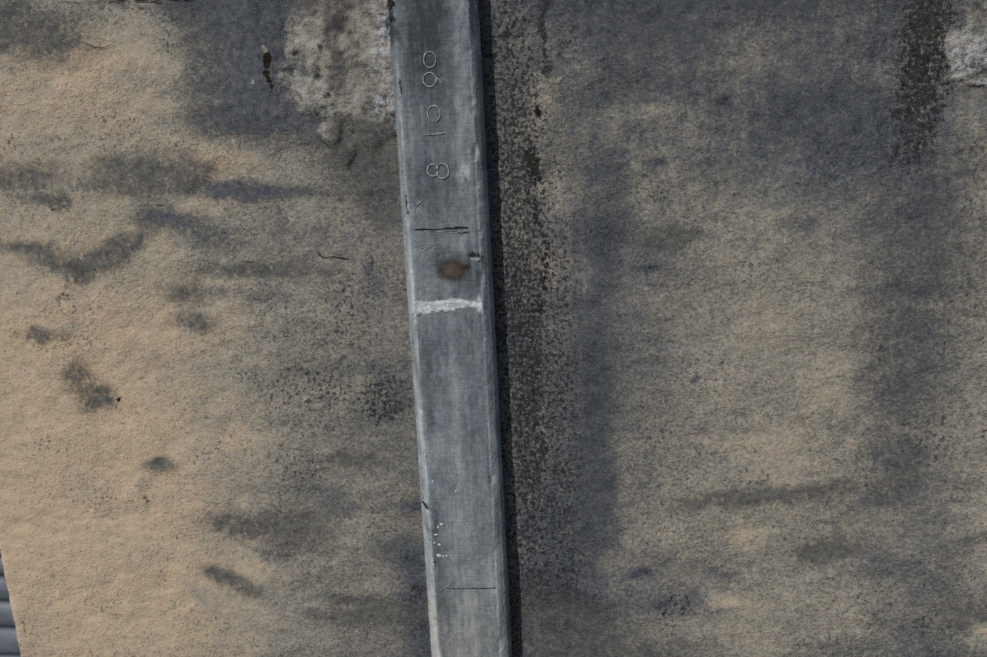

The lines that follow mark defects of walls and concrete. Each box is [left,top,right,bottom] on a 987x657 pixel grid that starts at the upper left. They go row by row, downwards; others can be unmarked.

leakage [537,0,552,77]
leakage [190,0,398,211]
leakage [888,0,953,167]
leakage [0,166,70,208]
leakage [96,157,294,202]
leakage [6,209,210,284]
leakage [217,260,305,277]
leakage [521,147,550,470]